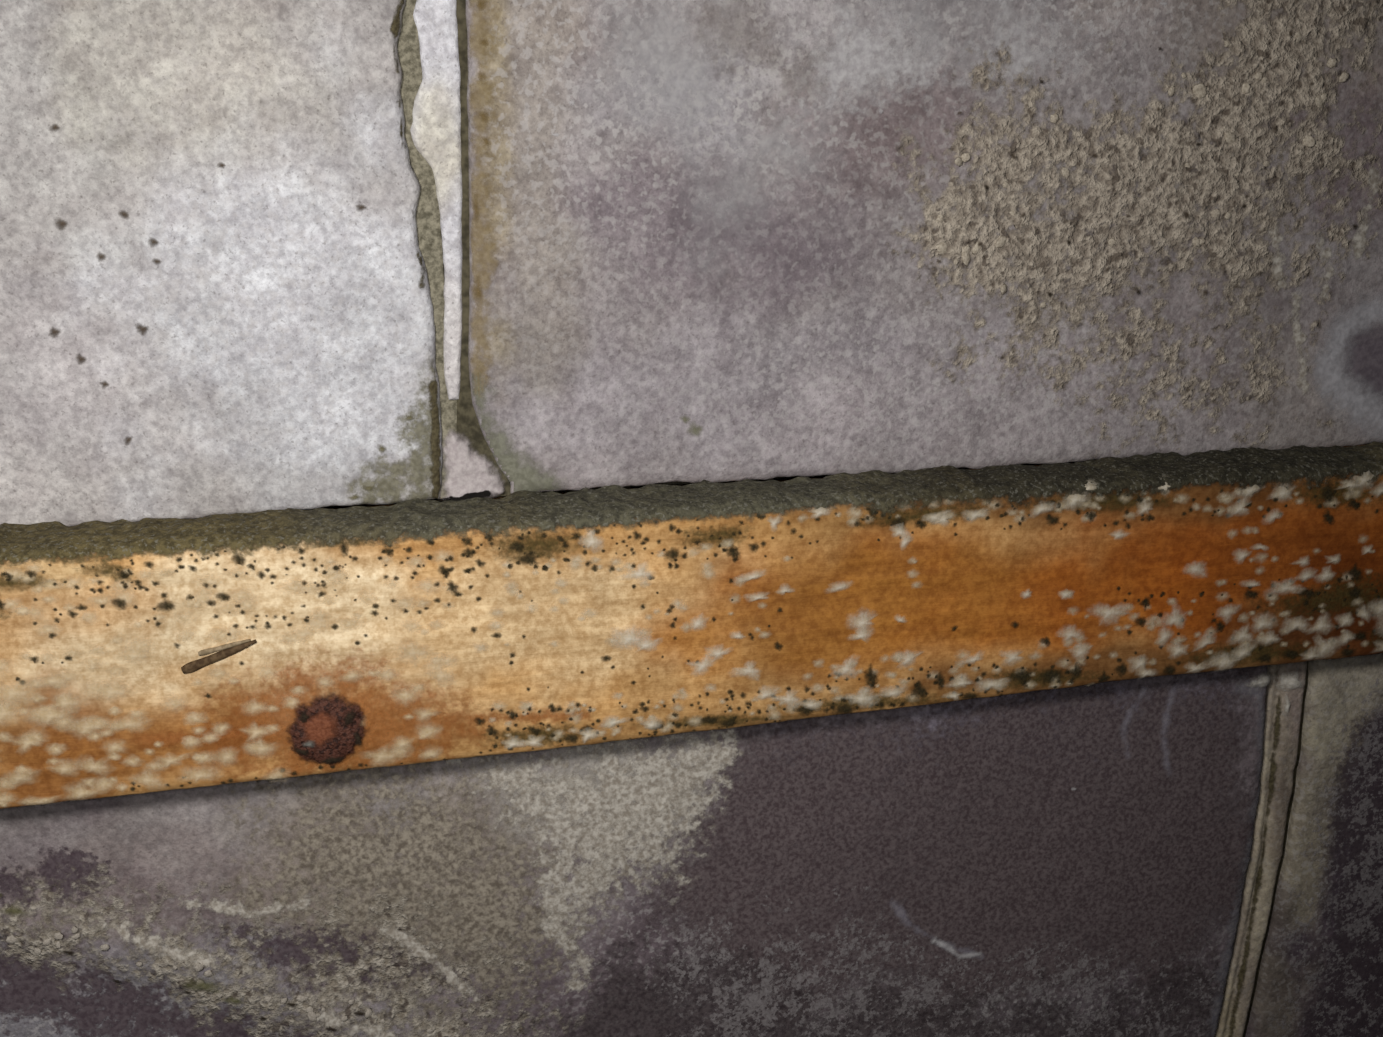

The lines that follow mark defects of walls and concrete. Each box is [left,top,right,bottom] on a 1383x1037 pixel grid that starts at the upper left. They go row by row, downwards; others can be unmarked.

corrosion [139,668,587,775]
damp [0,473,1383,1037]